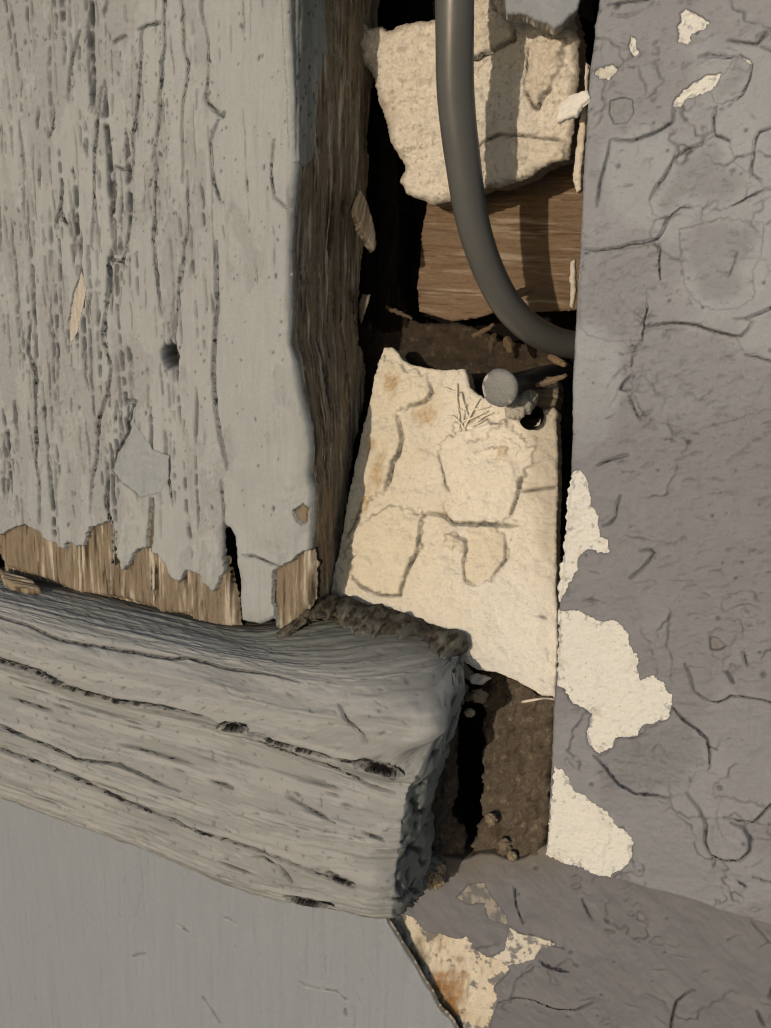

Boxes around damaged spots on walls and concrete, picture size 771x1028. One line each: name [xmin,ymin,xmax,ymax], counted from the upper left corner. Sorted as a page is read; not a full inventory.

peeling [678,10,709,44]
crack [55,0,223,595]
crack [211,240,228,527]
peeling [0,403,247,626]
crack [0,615,302,683]
peeling [275,547,323,629]
crack [353,452,557,596]
peeling [557,470,710,796]
crack [0,658,405,793]
peeling [546,766,634,877]
crack [594,757,771,888]
peeling [390,882,555,1028]